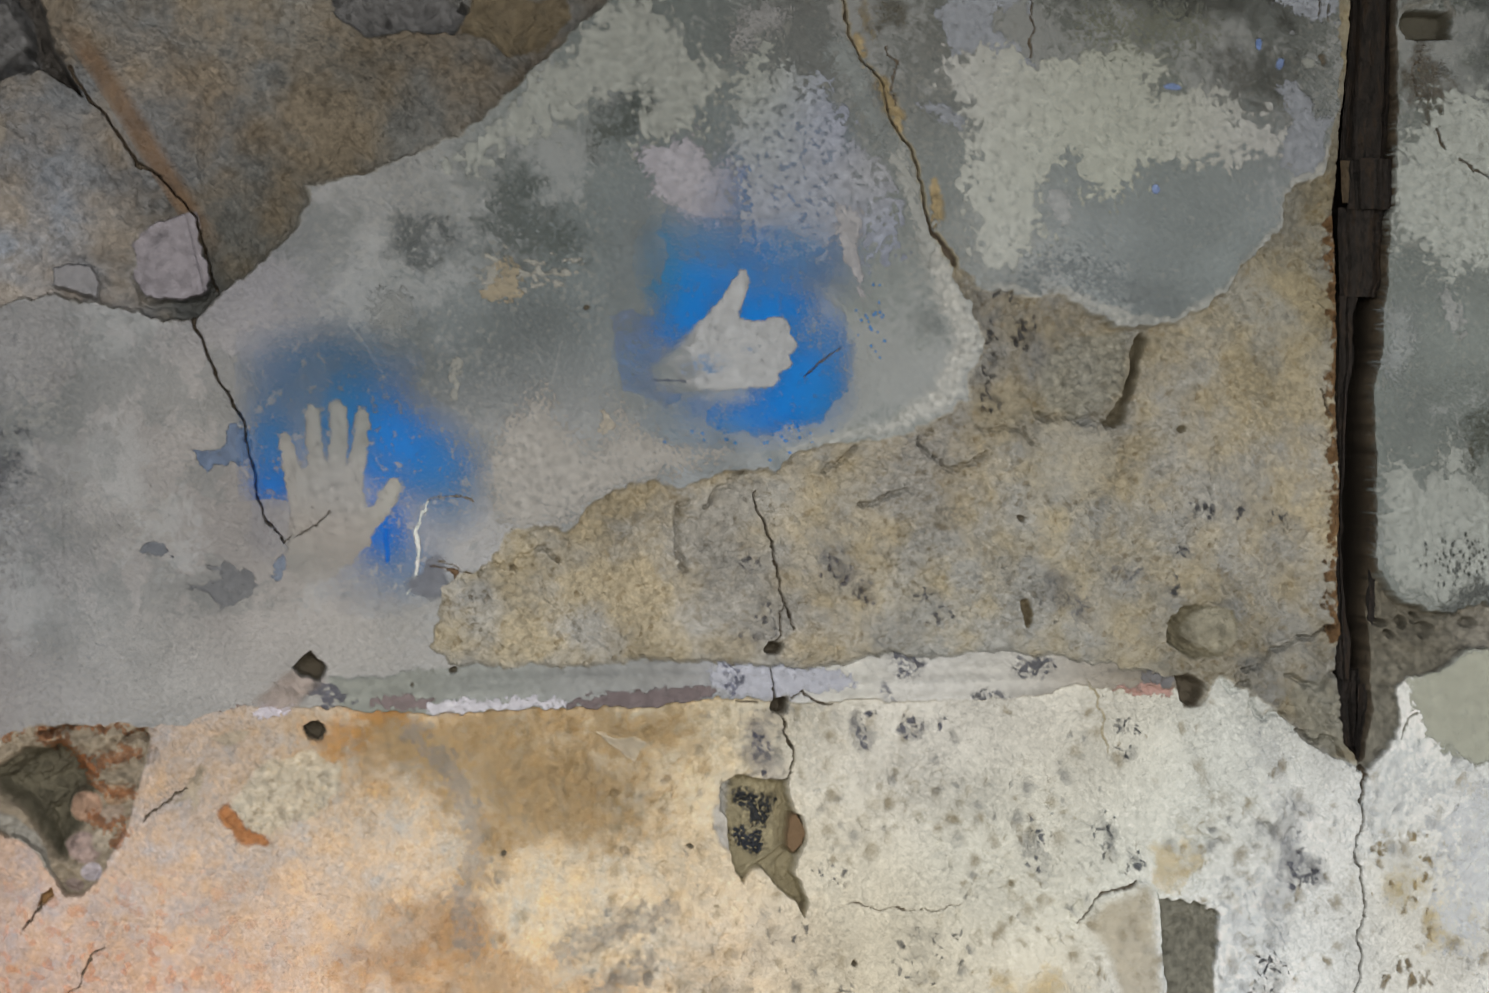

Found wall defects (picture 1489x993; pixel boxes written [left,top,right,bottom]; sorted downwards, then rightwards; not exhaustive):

crack [842,0,958,267]
crack [67,65,331,544]
flaking render [0,0,1489,772]
crack [736,491,834,782]
flaking render [0,723,151,907]
crack [70,947,107,993]
flaking render [719,775,809,917]
flaking render [1157,893,1221,993]
crack [1353,765,1369,993]